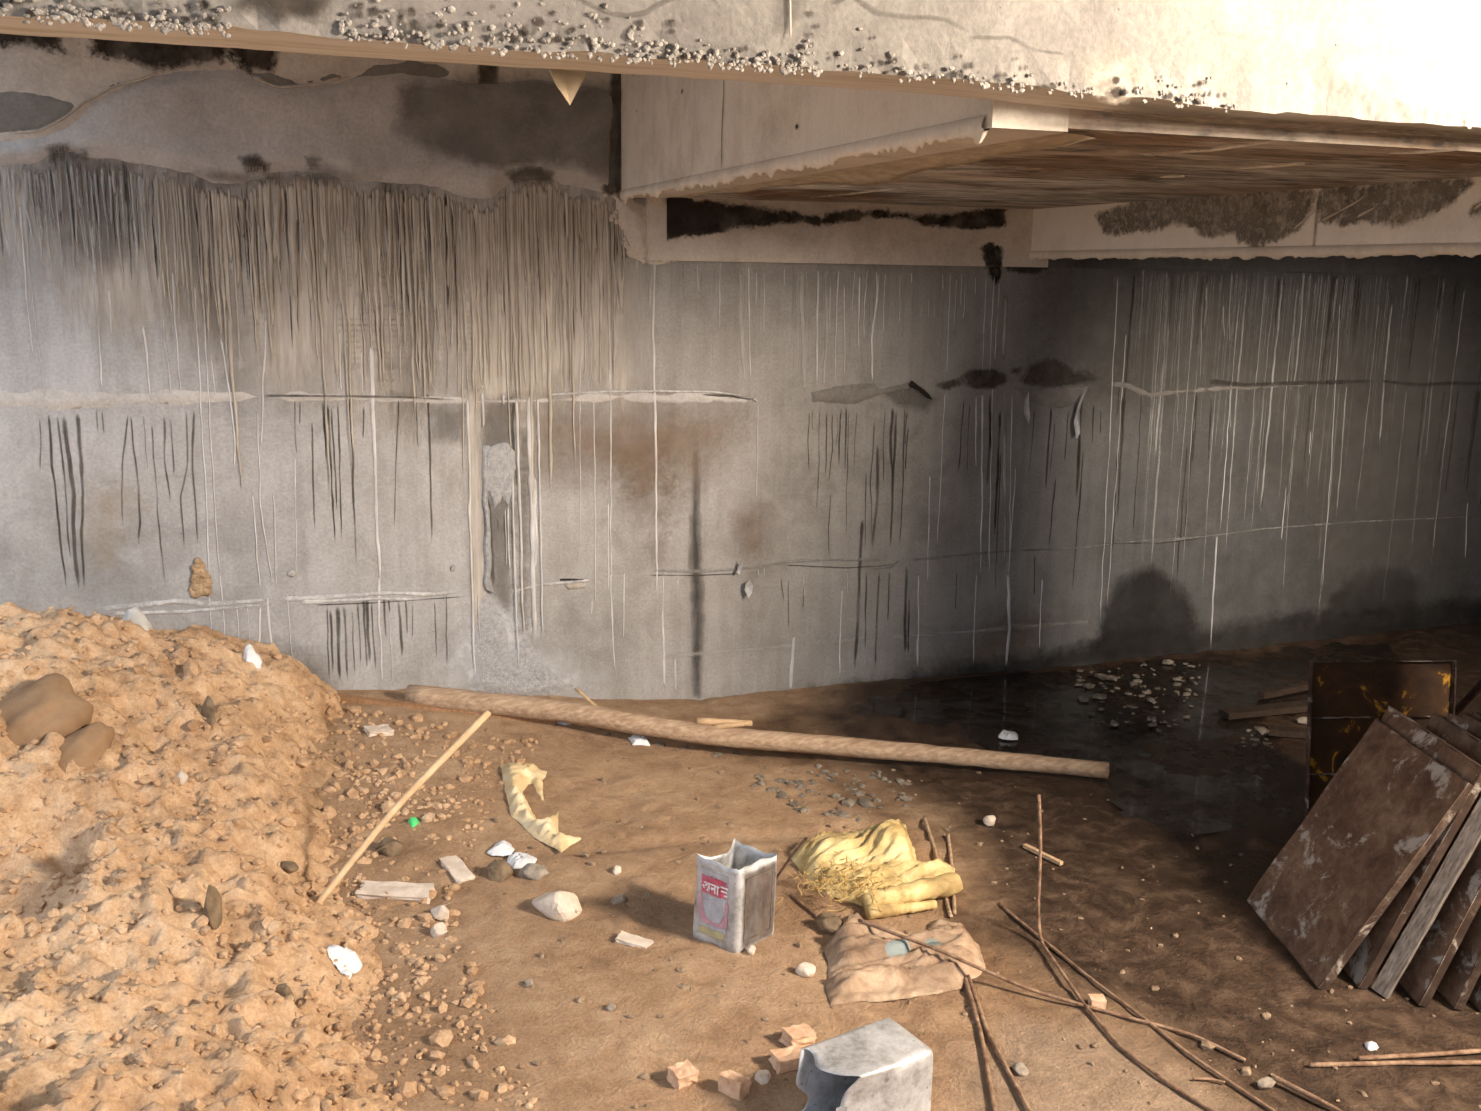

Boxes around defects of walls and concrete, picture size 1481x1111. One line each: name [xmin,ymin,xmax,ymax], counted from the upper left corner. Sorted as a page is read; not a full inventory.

damp [0,33,65,54]
spalling [87,0,134,21]
spalling [156,0,221,25]
spalling [355,3,469,44]
spalling [509,11,591,48]
damp [88,38,499,162]
damp [0,73,638,696]
damp [914,275,1481,678]
damp [692,484,702,684]